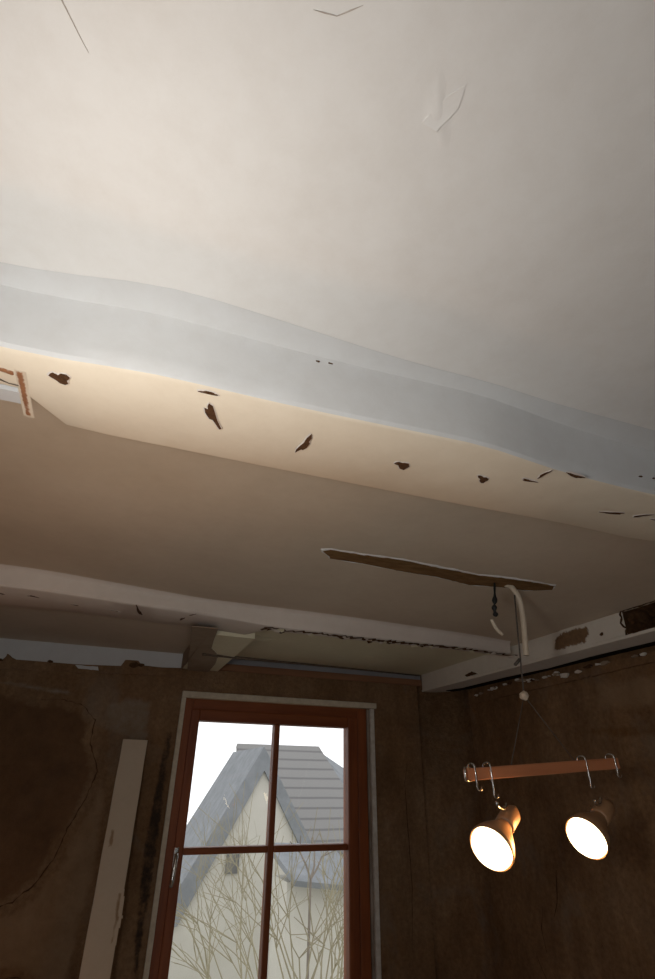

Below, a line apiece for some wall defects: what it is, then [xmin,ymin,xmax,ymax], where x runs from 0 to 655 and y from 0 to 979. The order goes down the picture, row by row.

spalling [197,389,222,430]
spalling [295,433,313,452]
spalling [393,461,410,470]
spalling [321,548,556,591]
spalling [552,624,603,653]
spalling [474,651,655,703]
water stain [128,728,177,979]